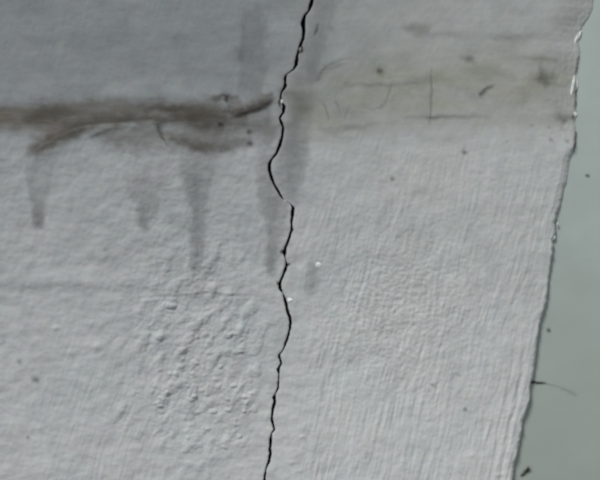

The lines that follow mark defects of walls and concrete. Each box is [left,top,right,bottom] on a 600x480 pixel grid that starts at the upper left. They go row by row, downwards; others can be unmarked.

crack [263,0,314,480]